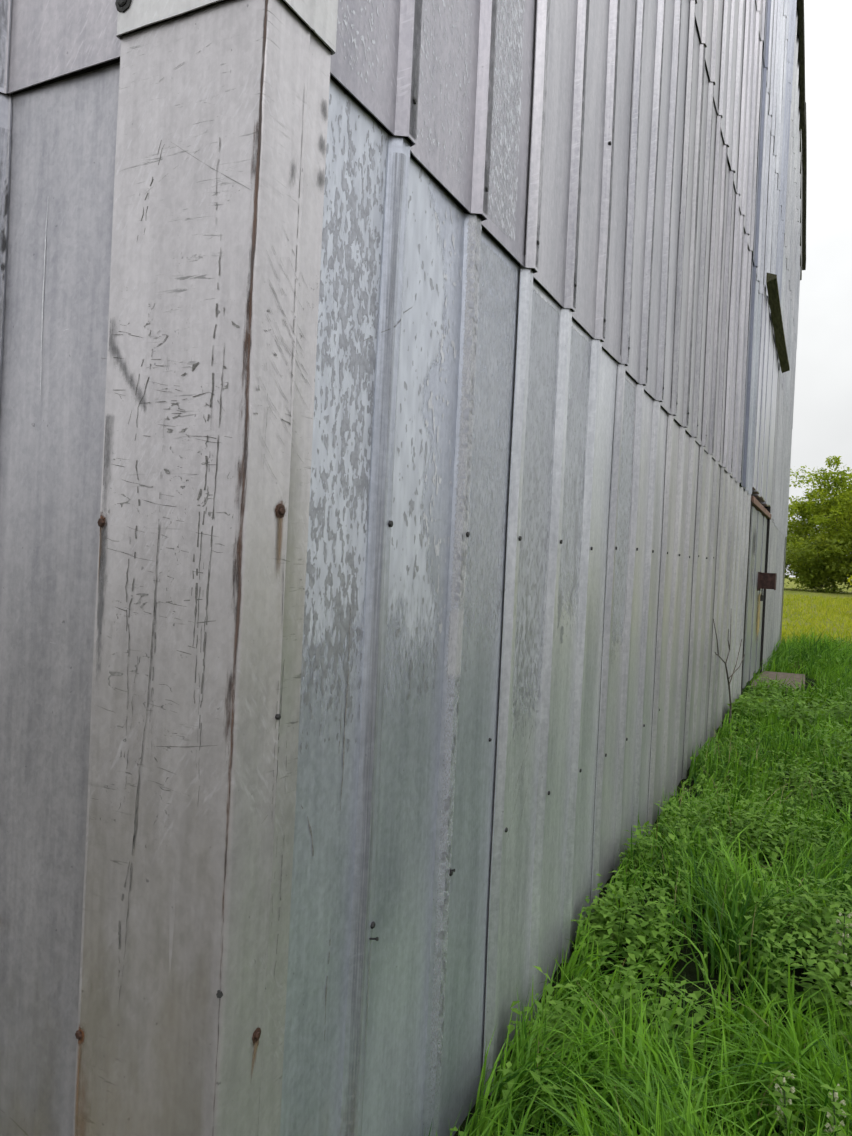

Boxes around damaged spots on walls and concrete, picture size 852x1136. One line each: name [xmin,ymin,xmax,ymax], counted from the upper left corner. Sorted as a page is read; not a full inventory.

corrosion [276,501,285,562]
peeling [299,79,388,758]